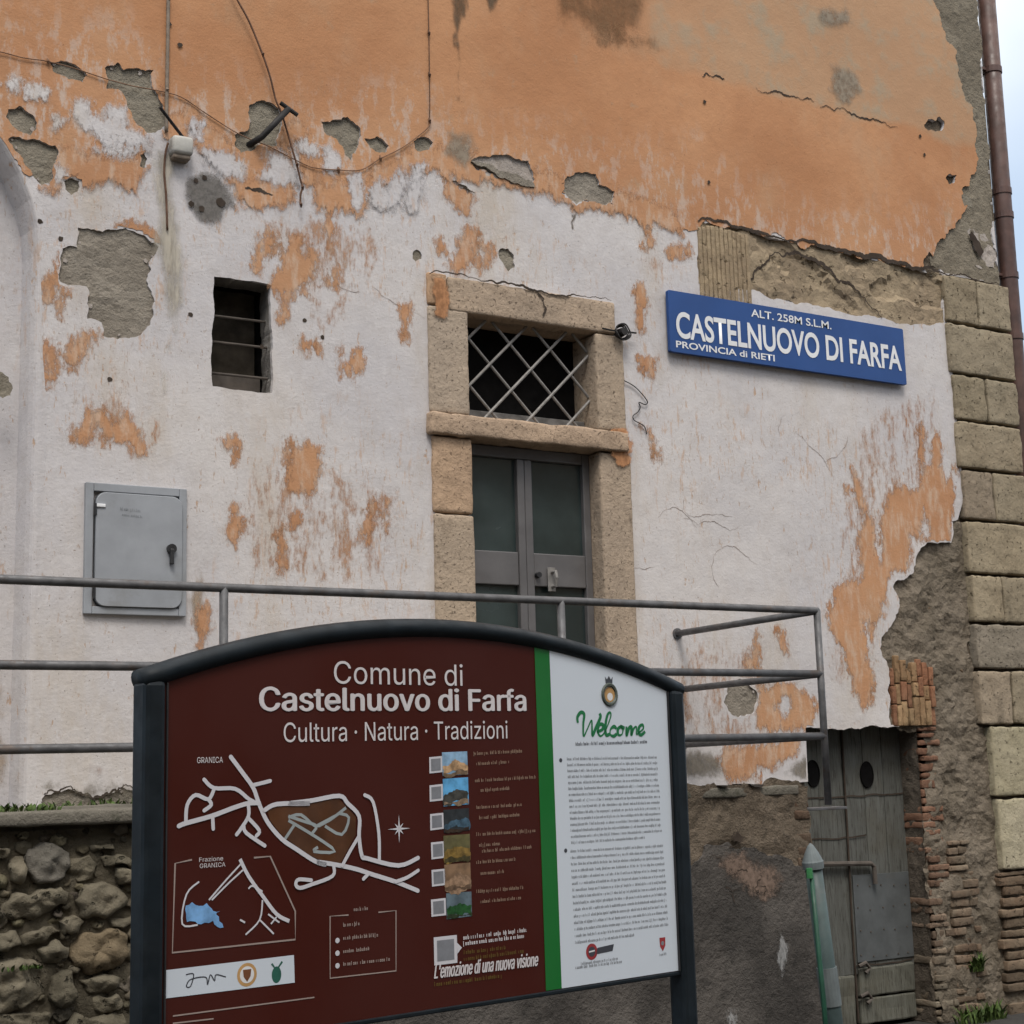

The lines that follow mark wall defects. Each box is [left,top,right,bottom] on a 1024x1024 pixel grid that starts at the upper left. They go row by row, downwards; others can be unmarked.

spalling [1,75,79,195]
spalling [50,62,165,168]
spalling [188,101,301,188]
peeling [298,118,432,214]
crack [758,90,896,127]
spalling [666,0,1000,326]
spalling [41,217,161,390]
crack [429,270,612,317]
crack [698,217,999,318]
crack [661,501,752,586]
spalling [687,625,819,866]
spalling [825,401,1024,1024]